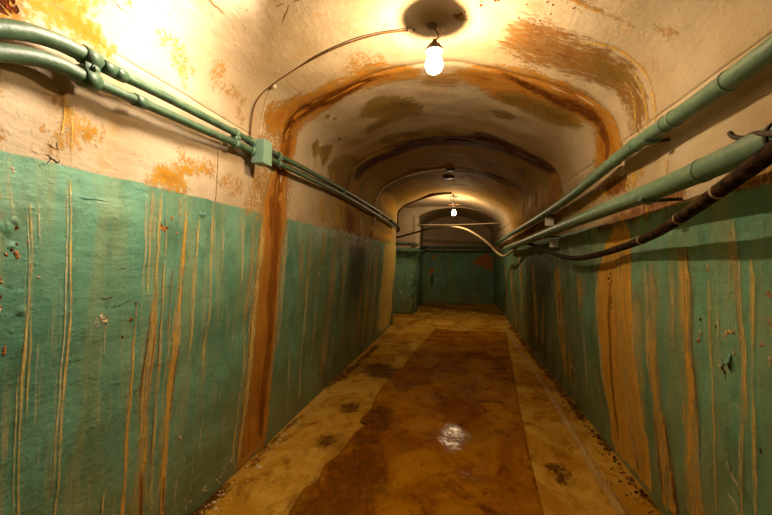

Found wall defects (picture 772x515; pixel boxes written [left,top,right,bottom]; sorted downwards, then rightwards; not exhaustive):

spalling [0,0,20,16]
damp [359,96,426,145]
rust [145,14,656,470]
damp [327,344,397,387]
rust [595,190,685,515]
rust [669,250,704,515]
damp [293,407,394,515]
damp [545,463,575,486]